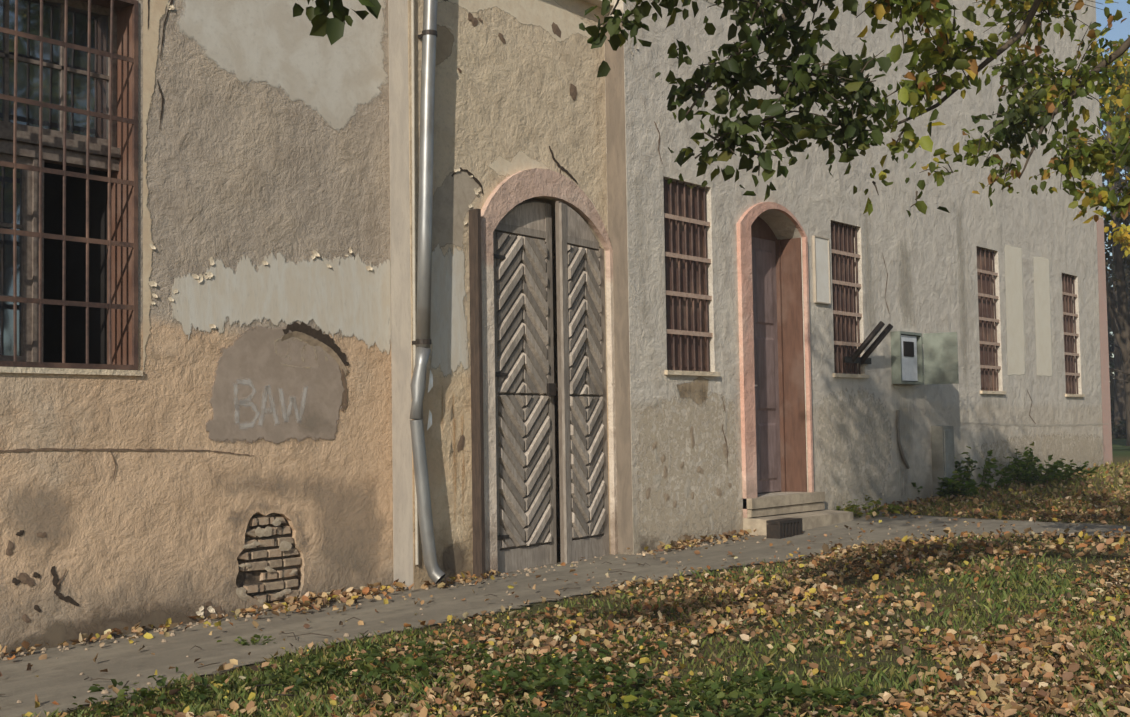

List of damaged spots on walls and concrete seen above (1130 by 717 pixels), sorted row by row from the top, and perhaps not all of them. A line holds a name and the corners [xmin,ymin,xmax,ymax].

peeling [438,0,591,42]
peeling [435,25,454,71]
peeling [486,151,549,176]
crack [549,146,578,184]
peeling [143,0,391,373]
crack [0,448,254,479]
spalling [6,530,47,556]
spalling [230,513,301,605]
spalling [12,572,41,587]